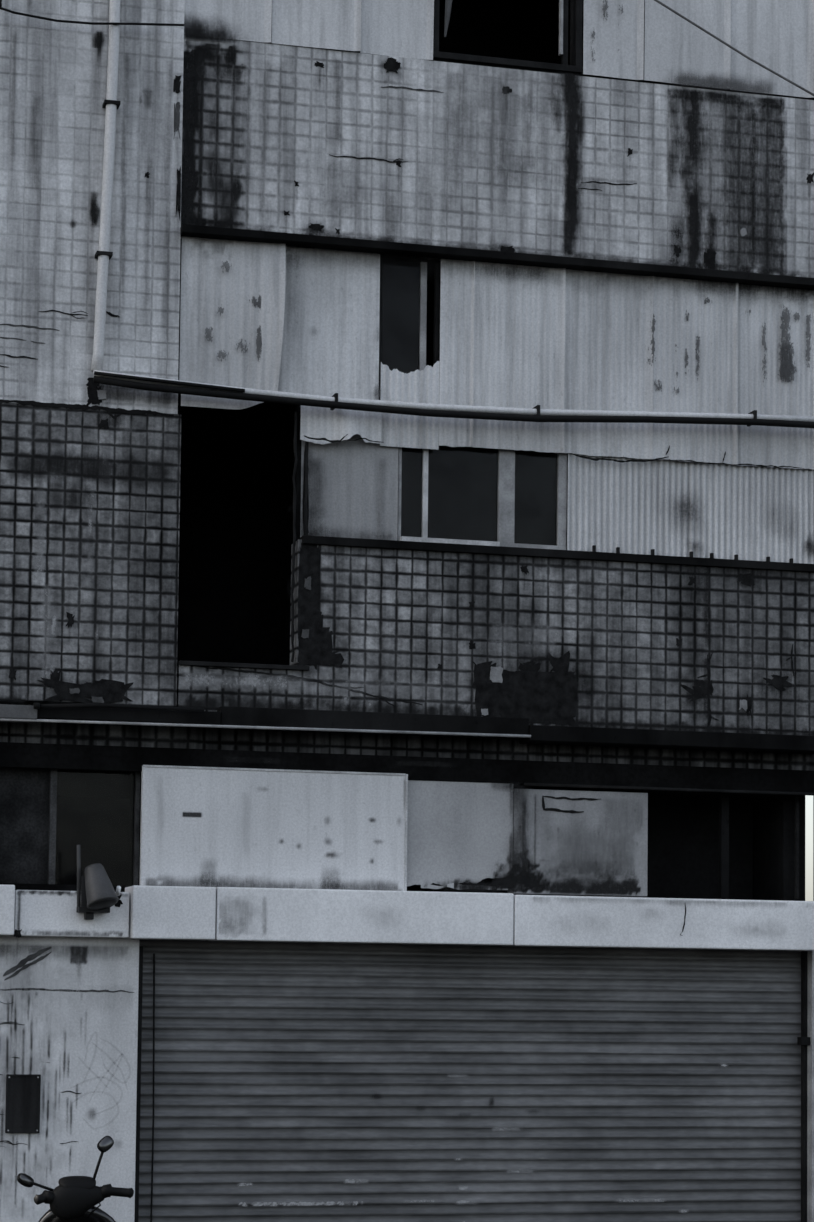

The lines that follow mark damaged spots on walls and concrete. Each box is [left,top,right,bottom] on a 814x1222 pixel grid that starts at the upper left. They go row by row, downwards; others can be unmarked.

water stain [181,28,265,231]
water stain [553,73,595,259]
water stain [612,75,814,294]
rust [205,307,262,361]
rust [761,306,811,383]
spalling [296,543,344,669]
spalling [37,669,134,703]
spalling [469,640,577,726]
water stain [444,783,641,895]